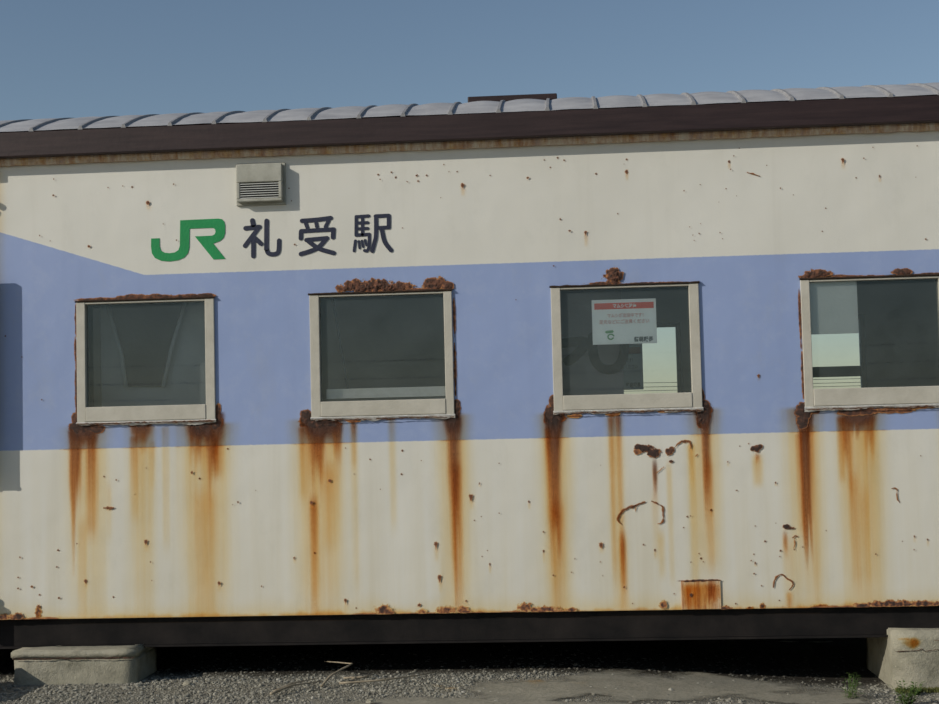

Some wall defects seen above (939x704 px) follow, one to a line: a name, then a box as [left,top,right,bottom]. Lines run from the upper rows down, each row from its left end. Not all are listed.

rust [798,268,939,278]
rust [190,403,223,443]
rust [298,409,360,443]
rust [335,276,461,471]
rust [544,395,582,478]
rust [695,389,713,456]
rust [794,292,820,505]
rust [837,407,935,425]